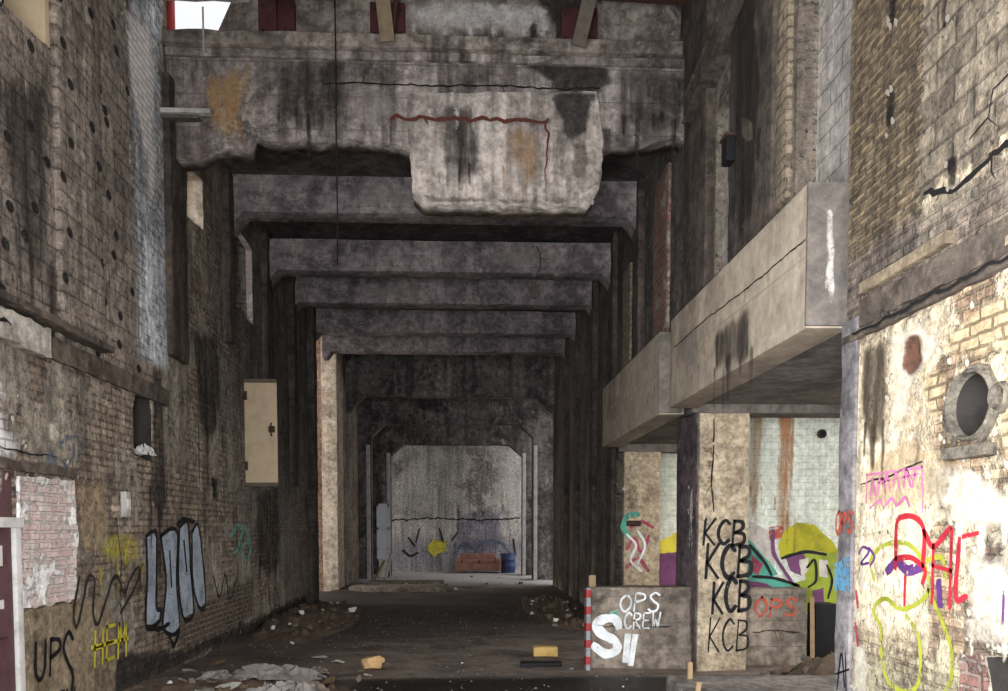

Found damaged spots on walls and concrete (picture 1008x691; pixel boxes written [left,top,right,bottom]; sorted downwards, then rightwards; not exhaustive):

water stain [446,96,489,181]
water stain [529,65,609,138]
crack [923,74,1008,197]
water stain [714,314,752,400]
water stain [863,347,886,484]
corrosion [774,418,794,533]
flaking render [0,416,118,691]